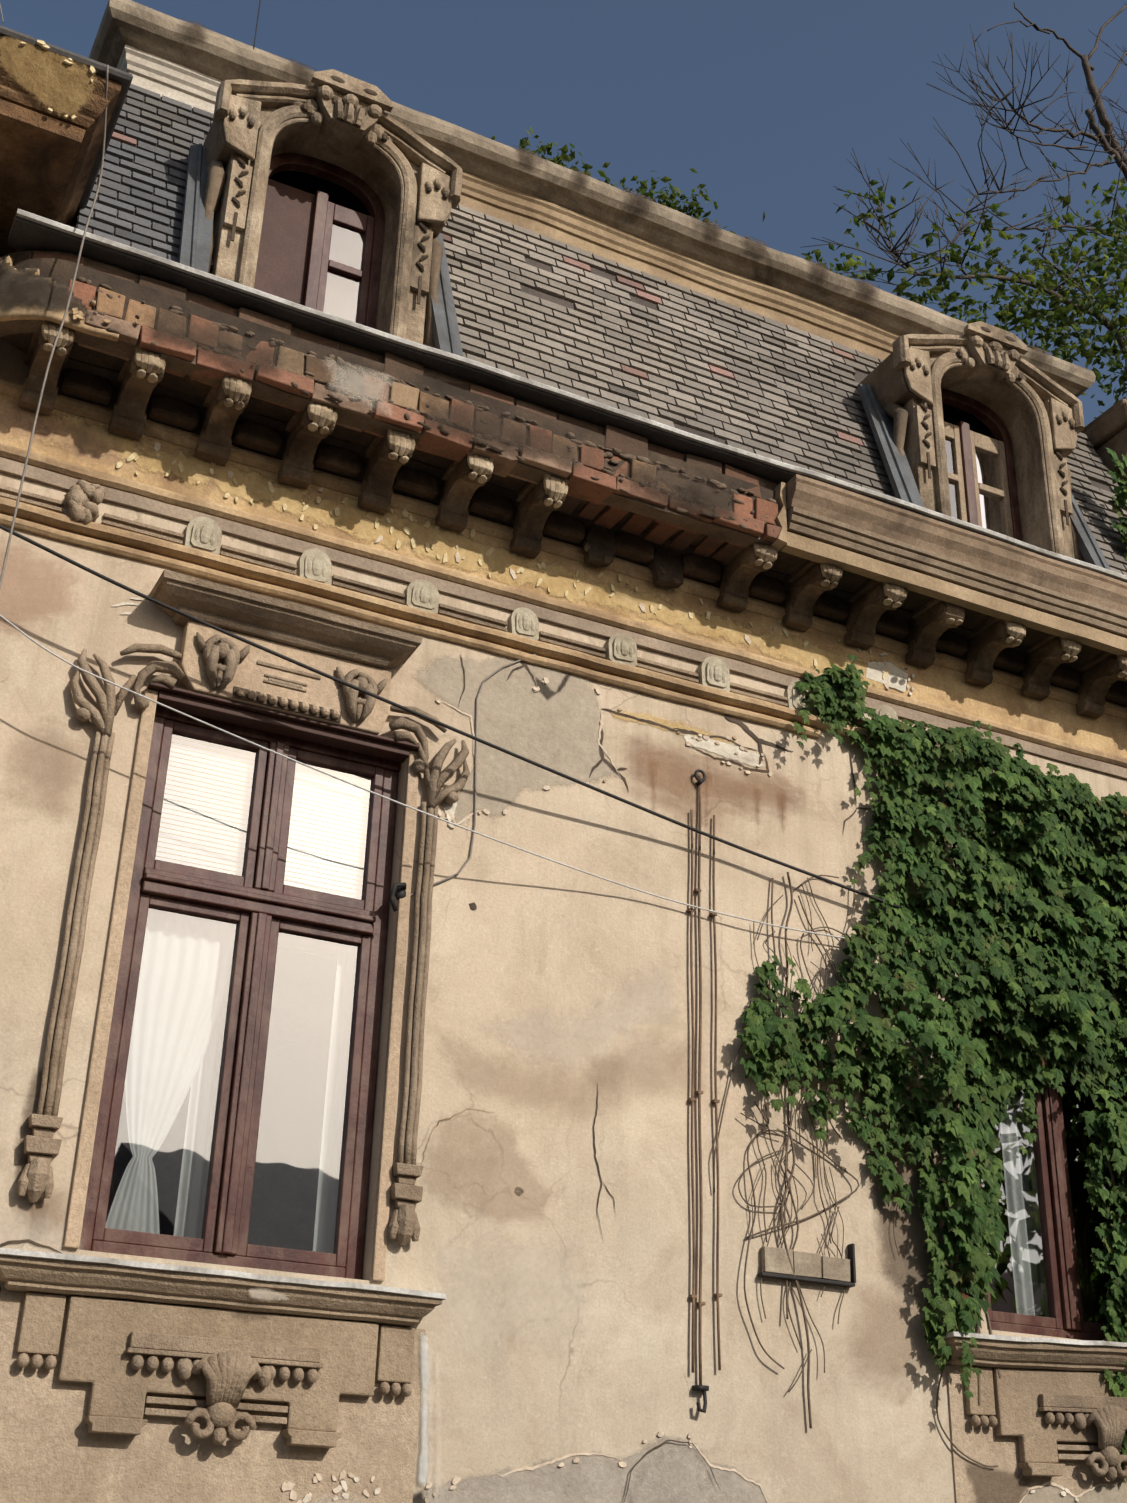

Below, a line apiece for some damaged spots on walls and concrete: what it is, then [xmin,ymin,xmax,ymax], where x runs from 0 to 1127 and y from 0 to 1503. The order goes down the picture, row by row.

peeling [0,37,96,120]
spalling [0,250,787,552]
peeling [40,415,915,696]
peeling [418,648,773,829]
crack [593,1084,615,1243]
peeling [281,1469,381,1503]
peeling [402,1432,768,1503]
peeling [1019,1482,1127,1503]